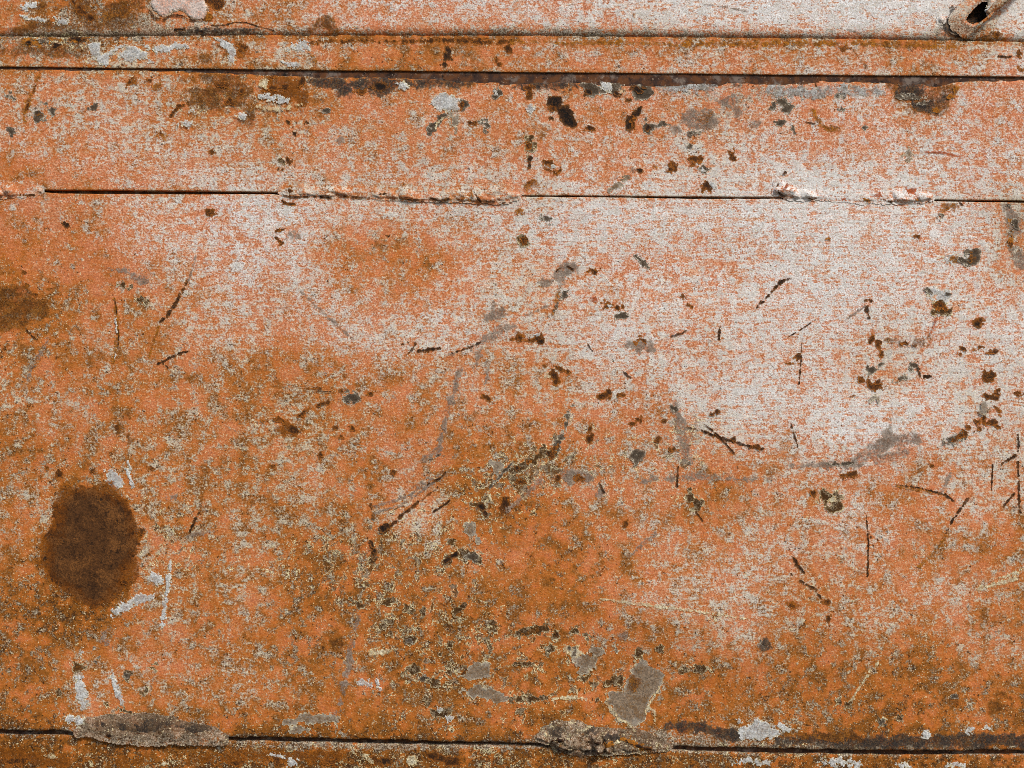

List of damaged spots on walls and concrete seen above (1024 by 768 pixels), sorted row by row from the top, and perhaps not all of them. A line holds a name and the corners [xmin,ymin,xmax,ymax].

rust [22,74,40,123]
rust [125,76,162,91]
rust [886,83,960,116]
rust [971,317,986,328]
rust [959,345,999,356]
rust [979,368,997,383]
rust [838,470,858,481]
rust [34,466,146,613]
peeling [368,596,429,656]
peeling [451,602,467,618]
peeling [52,647,212,740]
peeling [400,616,665,759]